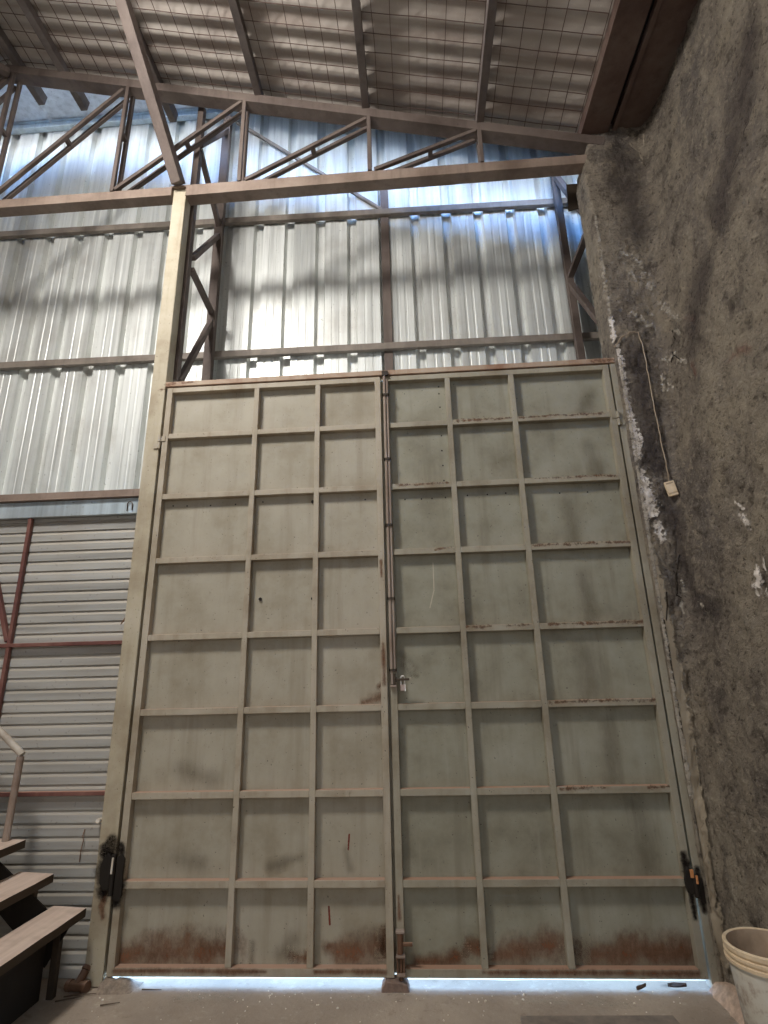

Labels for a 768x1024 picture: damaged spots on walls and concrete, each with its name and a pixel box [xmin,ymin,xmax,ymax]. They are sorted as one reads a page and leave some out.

water stain [594,210,694,798]
corrosion [114,932,266,975]
corrosion [289,928,386,974]
corrosion [415,933,699,977]